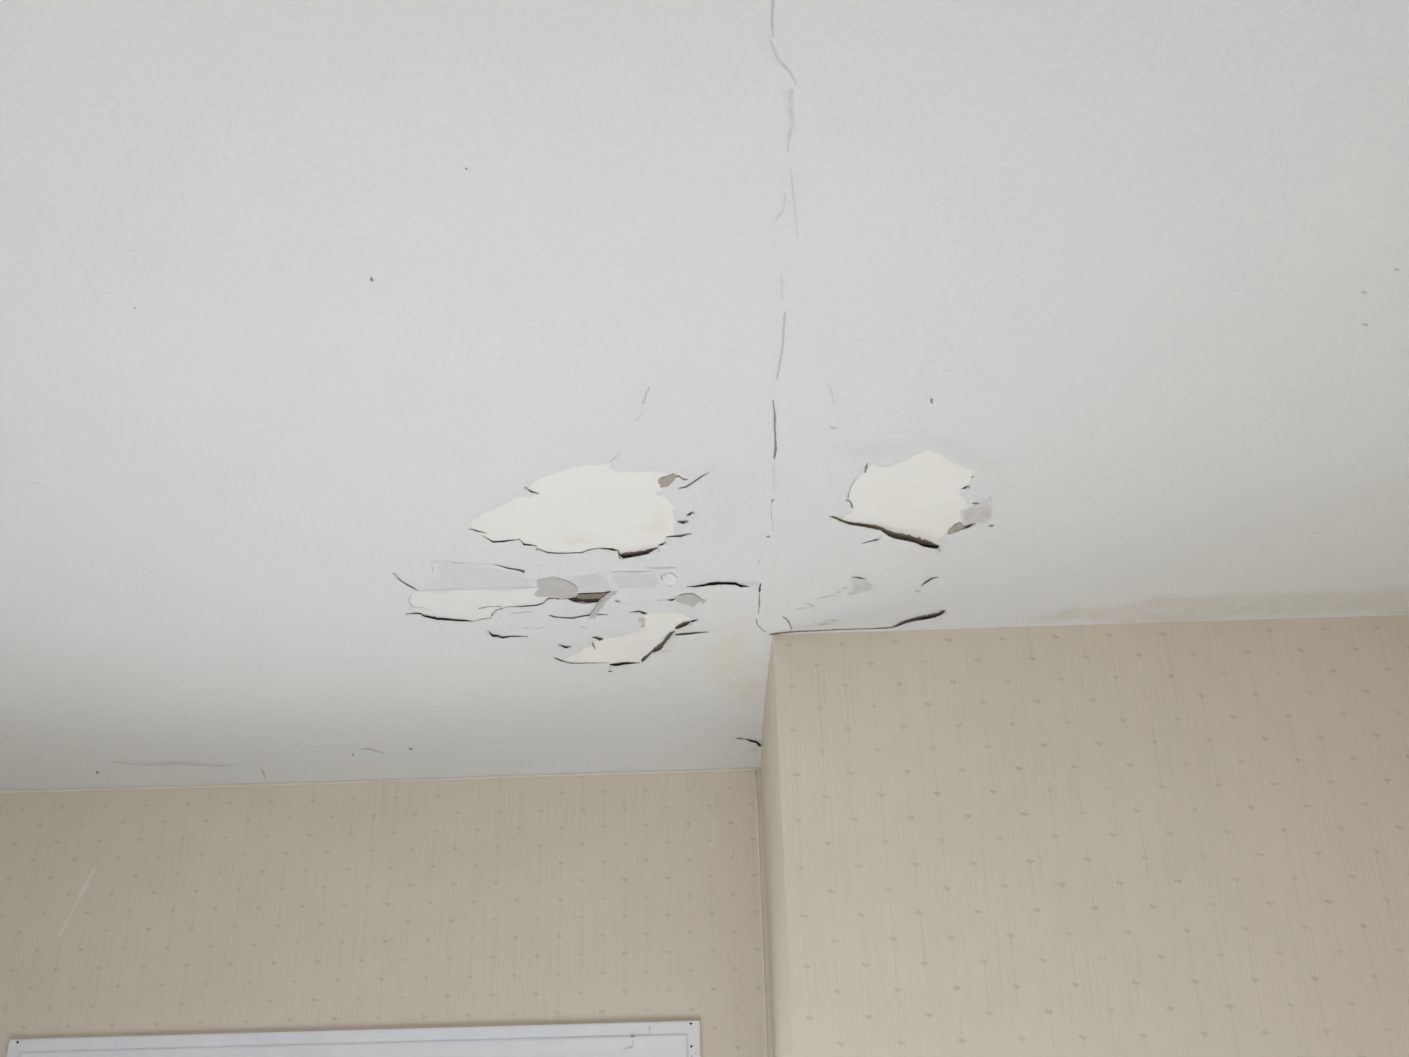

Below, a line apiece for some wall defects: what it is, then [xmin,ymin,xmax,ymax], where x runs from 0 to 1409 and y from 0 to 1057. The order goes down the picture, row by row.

crack [769,0,798,237]
peeling [391,453,710,672]
crack [687,273,947,635]
peeling [830,450,994,559]